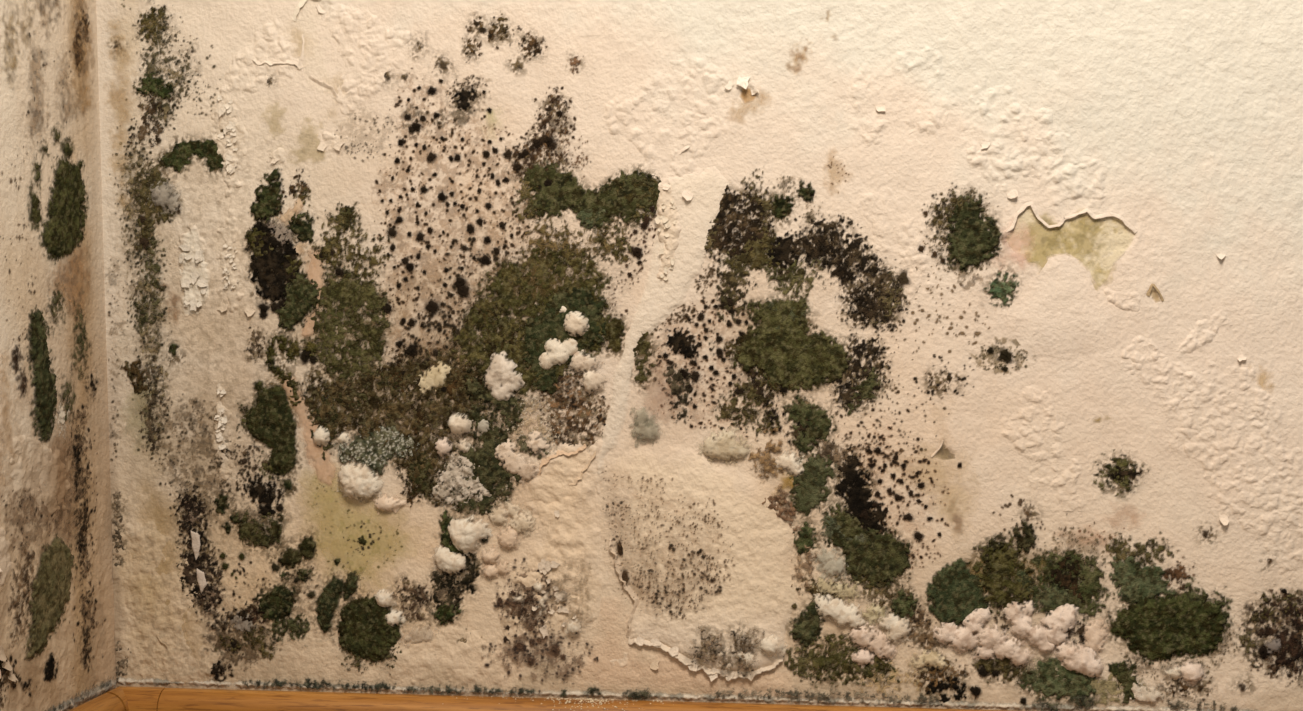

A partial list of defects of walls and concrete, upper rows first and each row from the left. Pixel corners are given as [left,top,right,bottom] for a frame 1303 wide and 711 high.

damp [0,4,601,711]
peeling [386,438,801,697]
damp [482,87,1303,711]
spalling [1004,188,1137,288]